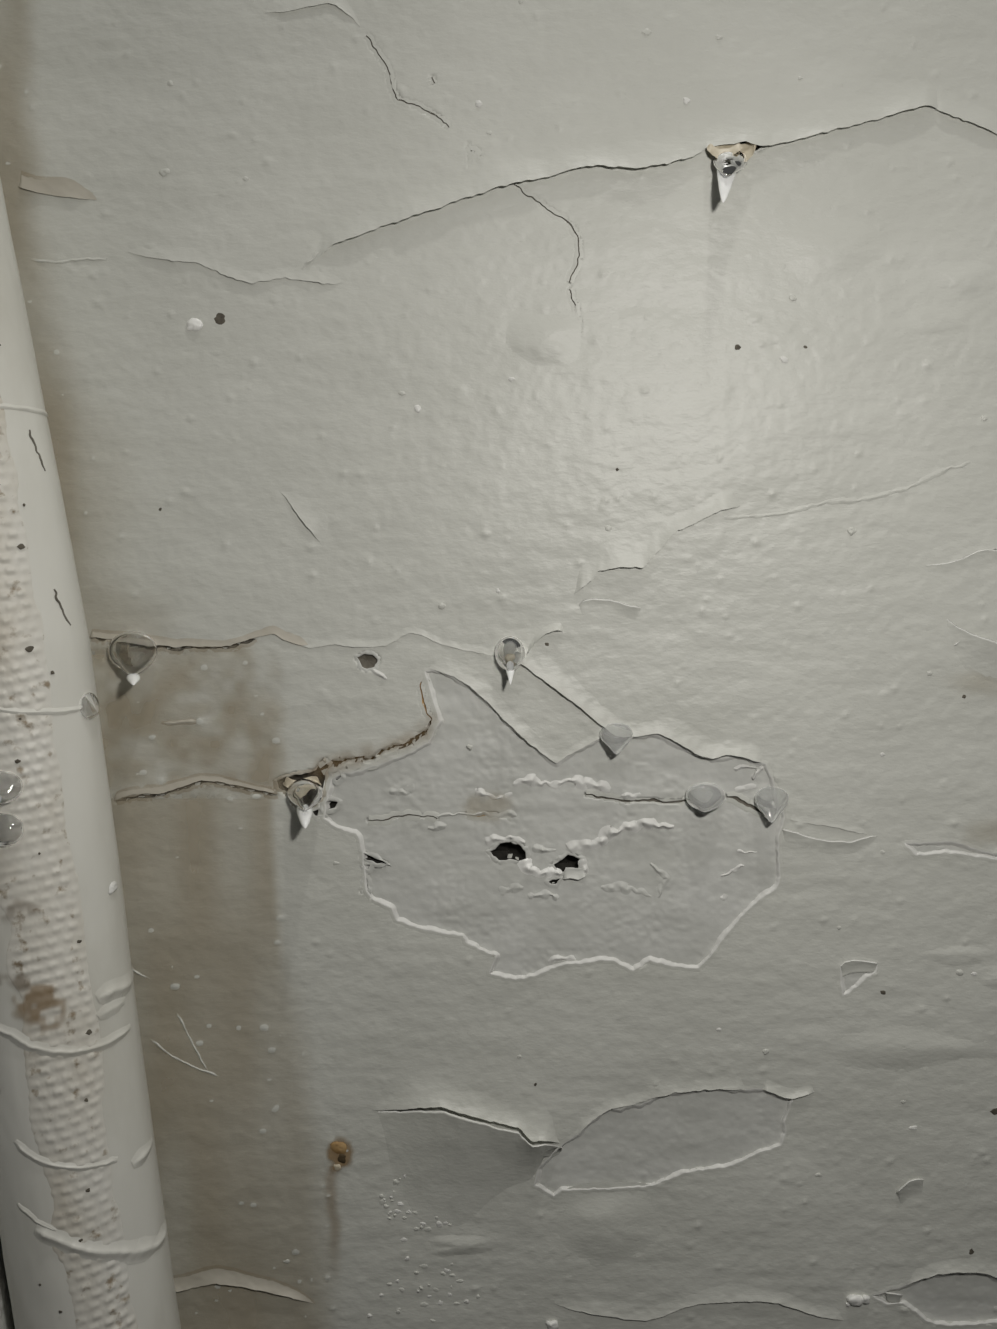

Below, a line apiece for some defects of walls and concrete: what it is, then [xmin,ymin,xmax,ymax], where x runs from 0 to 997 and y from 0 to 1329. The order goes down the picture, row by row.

peeling [263,0,361,27]
peeling [127,78,997,284]
peeling [574,487,741,620]
peeling [947,619,997,682]
spalling [273,642,877,983]
spalling [901,838,997,863]
corrosion [328,1141,351,1171]
spalling [372,1072,814,1226]
peeling [173,1265,316,1304]
peeling [553,1283,844,1321]
spalling [869,1256,997,1329]